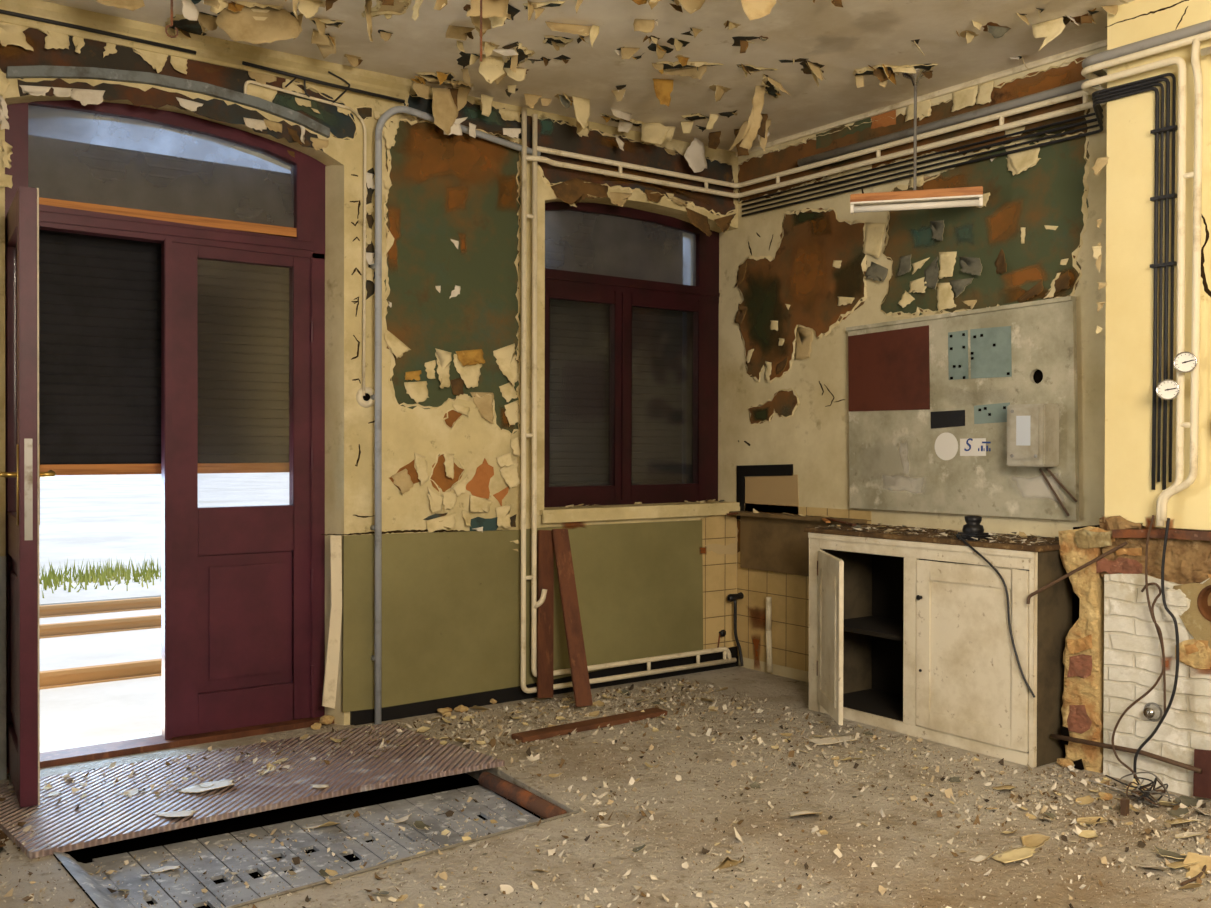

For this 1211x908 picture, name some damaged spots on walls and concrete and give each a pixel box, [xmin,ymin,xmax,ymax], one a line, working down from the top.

crack [1107,0,1189,30]
peeling [0,0,1127,555]
crack [1201,213,1211,297]
spalling [1057,515,1211,842]
peeling [1122,778,1211,890]